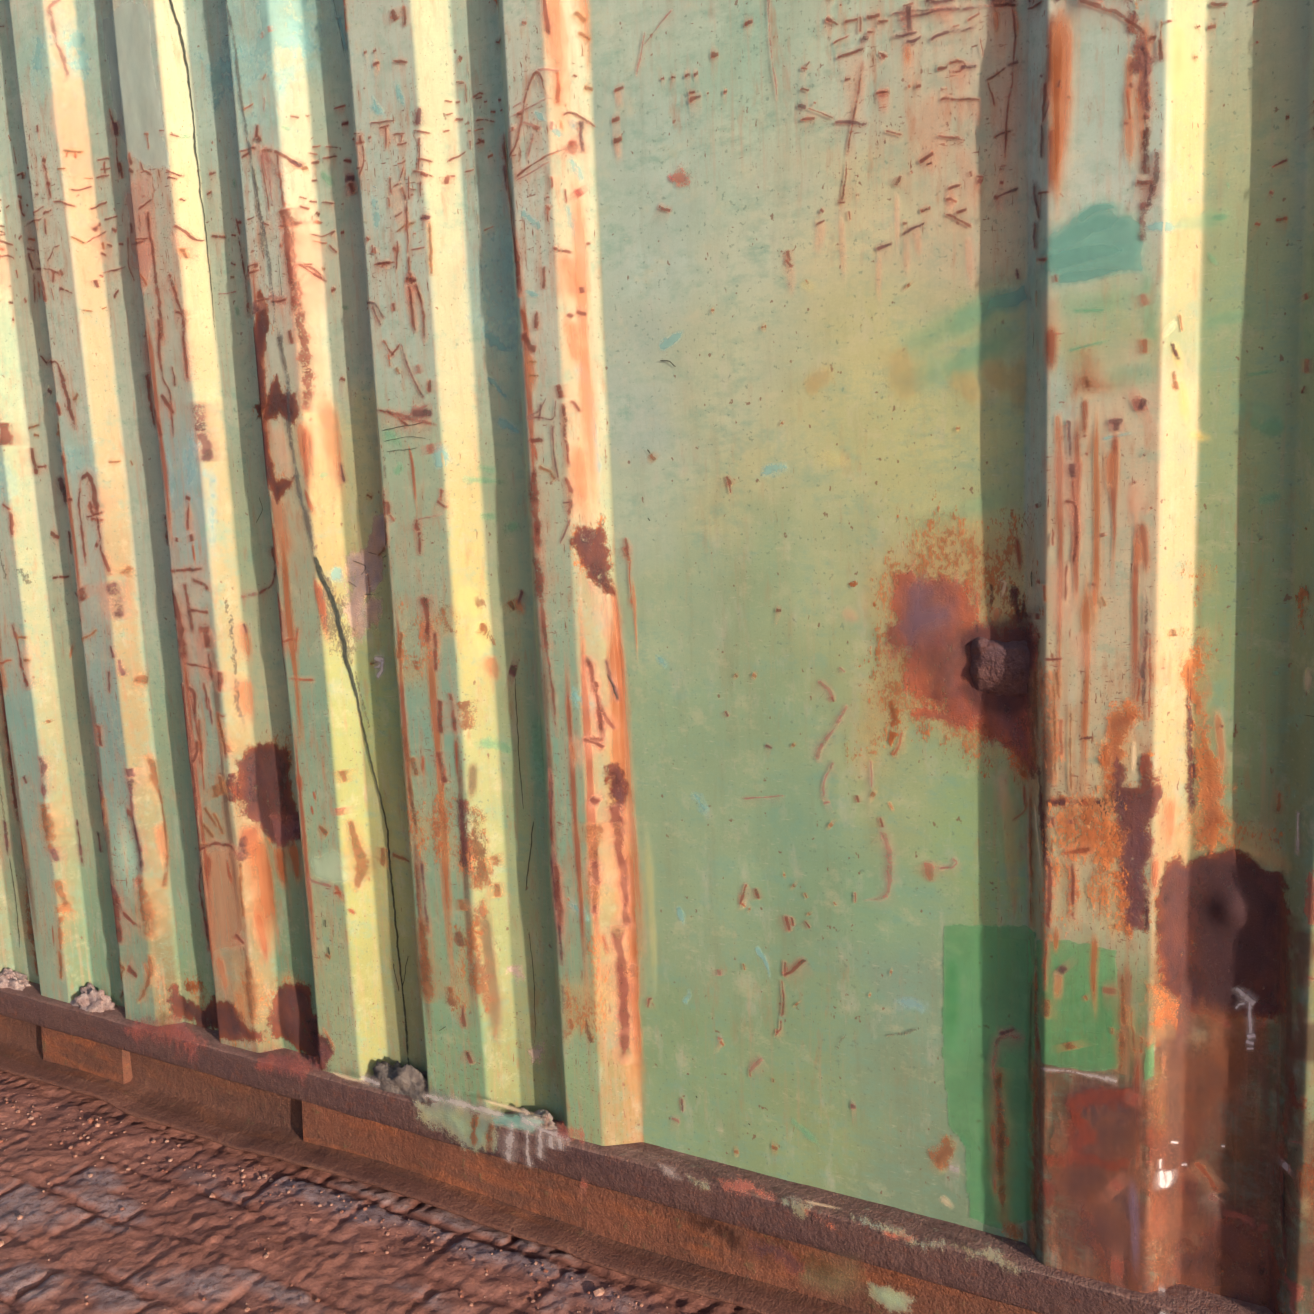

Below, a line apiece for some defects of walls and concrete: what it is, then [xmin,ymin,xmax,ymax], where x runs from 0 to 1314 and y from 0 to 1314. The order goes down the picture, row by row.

crack [169,0,215,327]
rust [236,125,323,521]
rust [543,0,552,33]
rust [1028,0,1070,262]
rust [50,451,133,618]
rust [108,646,148,693]
rust [127,199,370,958]
crack [225,0,409,1064]
rust [503,142,652,1059]
rust [110,757,169,943]
rust [119,956,333,1071]
rust [816,368,1314,1314]